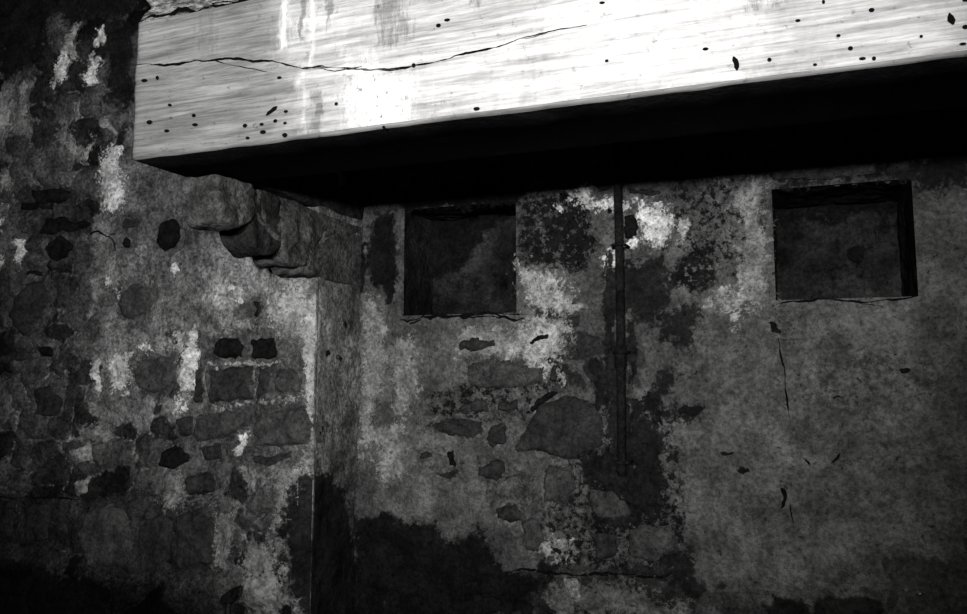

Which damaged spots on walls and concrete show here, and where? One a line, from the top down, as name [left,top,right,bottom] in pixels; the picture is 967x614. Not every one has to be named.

spalling [0,176,95,428]
peeling [53,101,118,169]
spalling [106,274,160,326]
spalling [115,208,187,256]
leakage [516,172,780,350]
spalling [69,295,324,614]
spalling [357,253,723,614]
leakage [536,366,705,582]